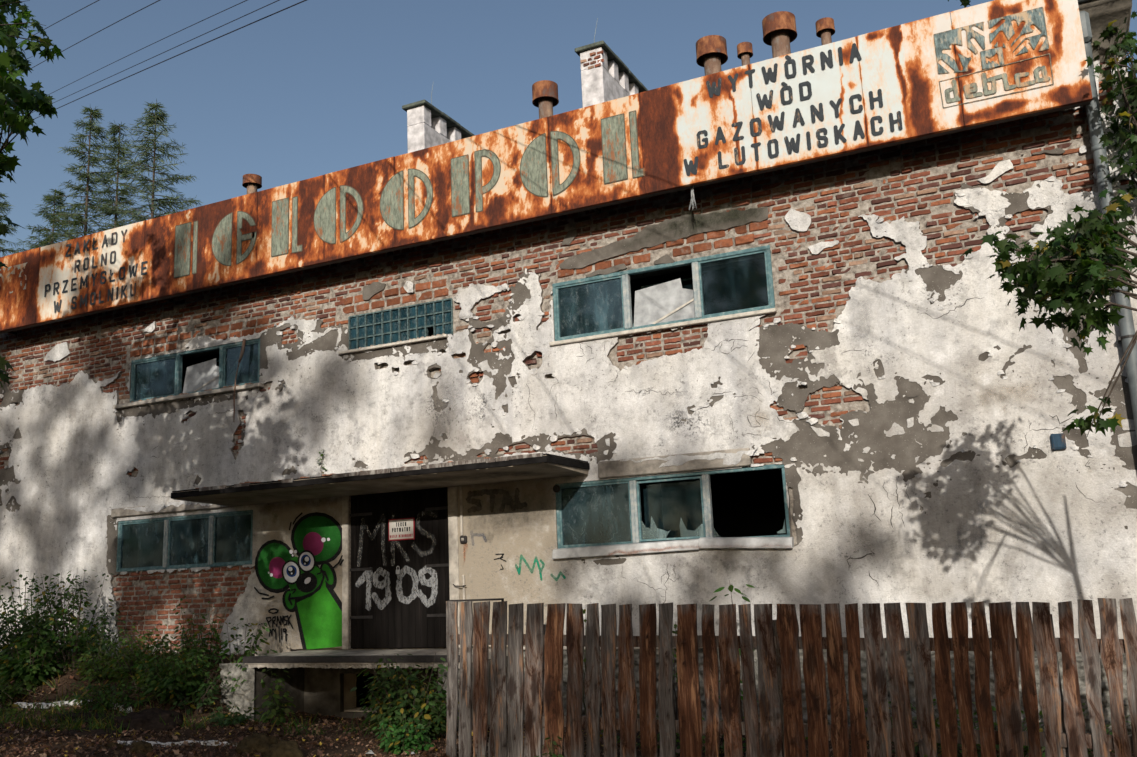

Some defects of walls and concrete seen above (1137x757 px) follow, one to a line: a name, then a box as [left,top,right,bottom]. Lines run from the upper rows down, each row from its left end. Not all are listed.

spalling [1098,62,1113,116]
spalling [0,108,1098,551]
peeling [1031,307,1137,509]